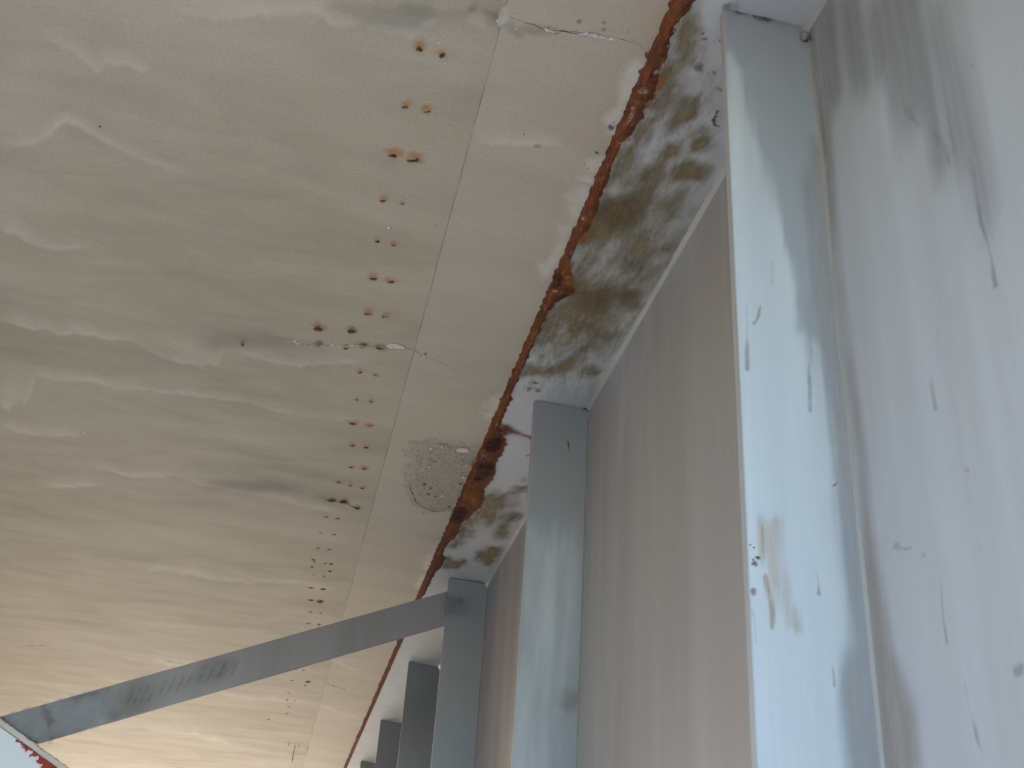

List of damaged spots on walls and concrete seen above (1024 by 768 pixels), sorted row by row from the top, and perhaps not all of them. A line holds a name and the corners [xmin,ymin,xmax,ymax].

crack [496,5,635,43]
corrosion [626,0,671,52]
leakage [595,53,647,138]
corrosion [608,13,706,185]
leakage [530,151,606,286]
corrosion [584,137,709,245]
corrosion [534,230,673,347]
crack [277,336,482,381]
leakage [475,380,508,423]
leakage [725,44,861,768]
spalling [398,436,500,523]
corrosion [443,494,520,568]